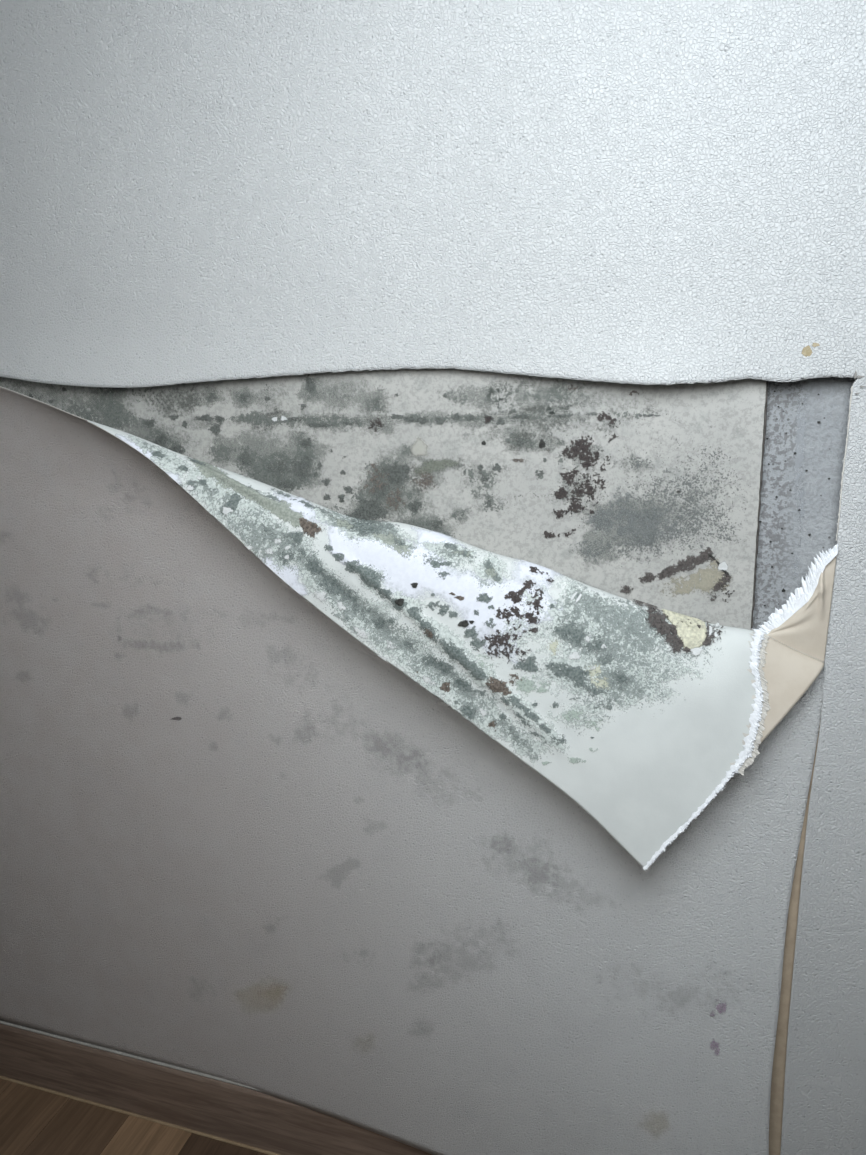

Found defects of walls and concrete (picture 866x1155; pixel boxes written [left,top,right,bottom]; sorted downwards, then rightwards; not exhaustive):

damp [0,374,746,765]
peeling [620,547,735,656]